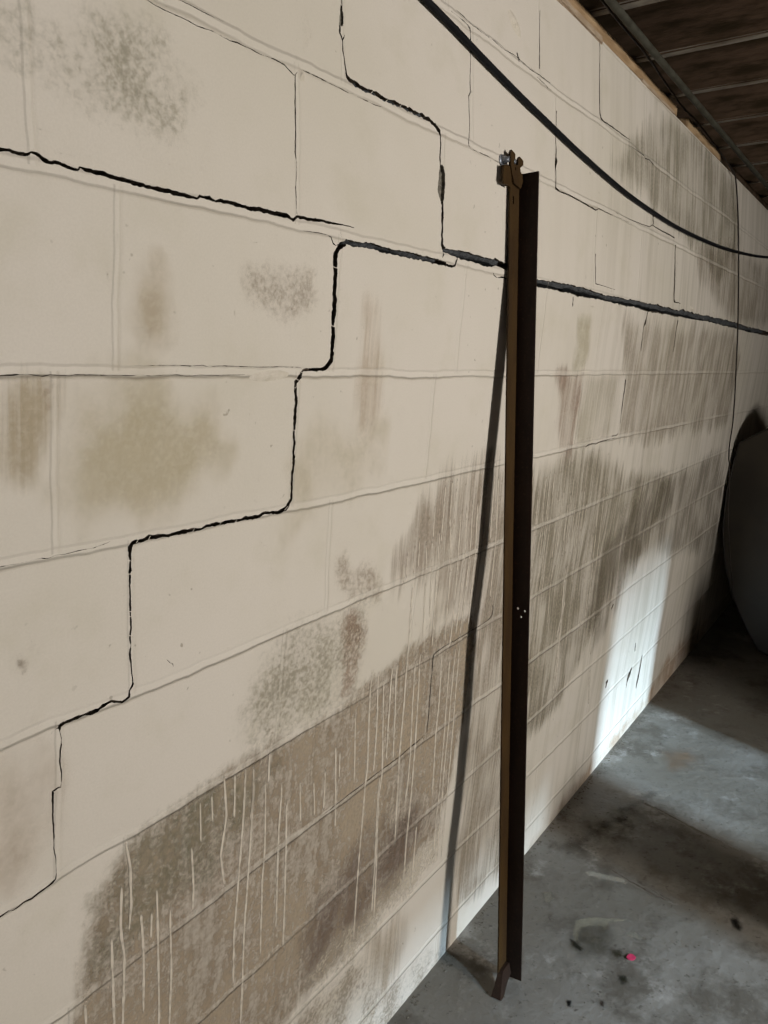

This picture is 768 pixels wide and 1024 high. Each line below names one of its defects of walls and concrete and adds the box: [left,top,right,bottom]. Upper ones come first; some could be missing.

crack [451,11,768,350]
crack [0,0,508,917]
leakage [75,469,504,1024]
leakage [528,455,670,726]
crack [586,380,626,447]
crack [644,803,740,851]